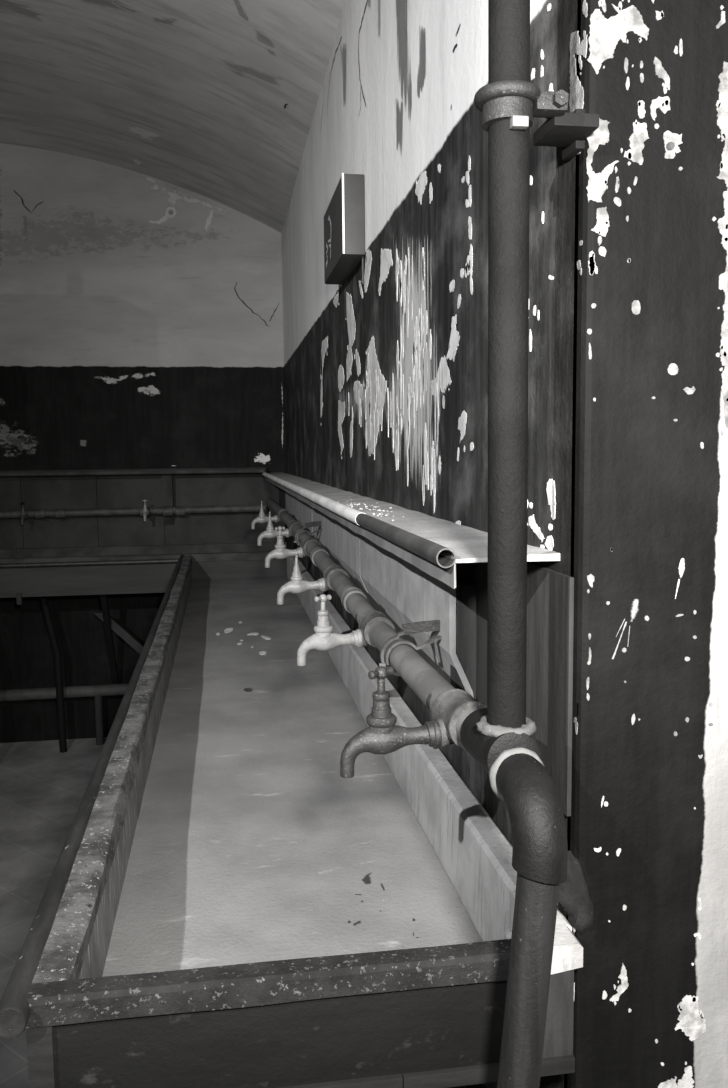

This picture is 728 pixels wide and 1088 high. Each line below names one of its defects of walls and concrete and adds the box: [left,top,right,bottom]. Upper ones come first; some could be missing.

damp [396,0,425,150]
peeling [531,49,553,91]
peeling [569,0,683,276]
peeling [712,61,728,251]
crack [14,190,44,213]
peeling [101,372,160,396]
crack [234,282,280,327]
peeling [333,155,474,513]
peeling [716,265,728,435]
peeling [527,479,556,550]
peeling [675,995,706,1041]
peeling [658,1061,694,1088]